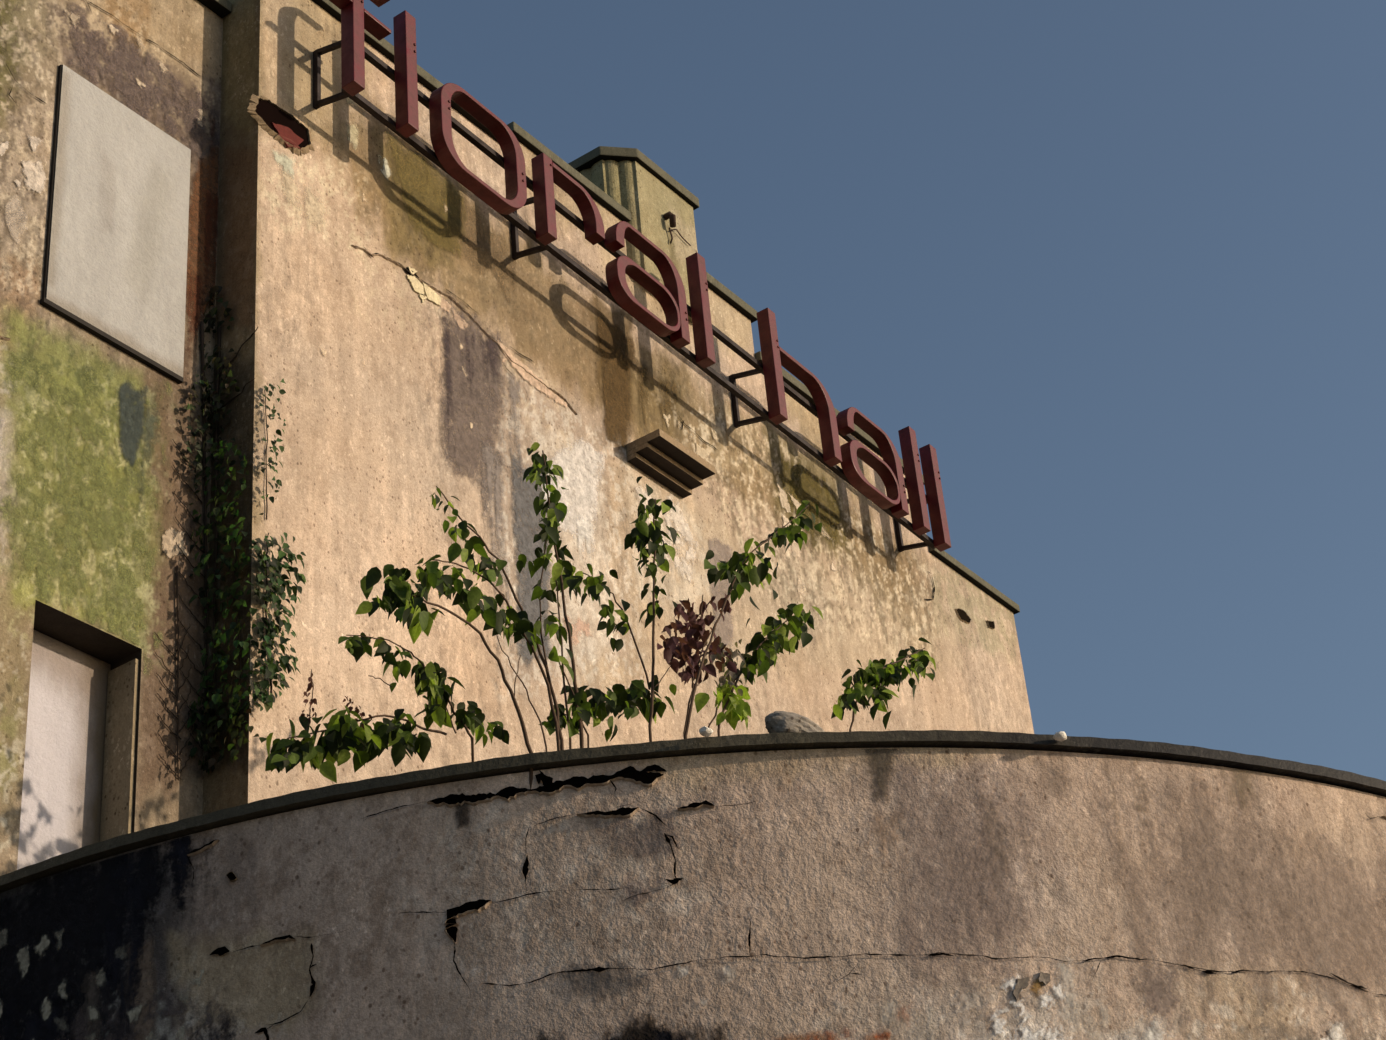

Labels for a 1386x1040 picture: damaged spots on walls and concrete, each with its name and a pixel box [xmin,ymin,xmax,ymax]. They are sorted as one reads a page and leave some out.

spalling [247,94,315,156]
crack [351,245,577,415]
damp [119,383,158,476]
crack [364,764,1386,996]
peeling [17,936,50,977]
peeling [42,982,67,1020]
damp [0,835,234,1040]
peeling [128,1005,142,1022]
crack [210,932,338,1040]
damp [605,1014,726,1040]
peeling [1012,972,1050,1001]